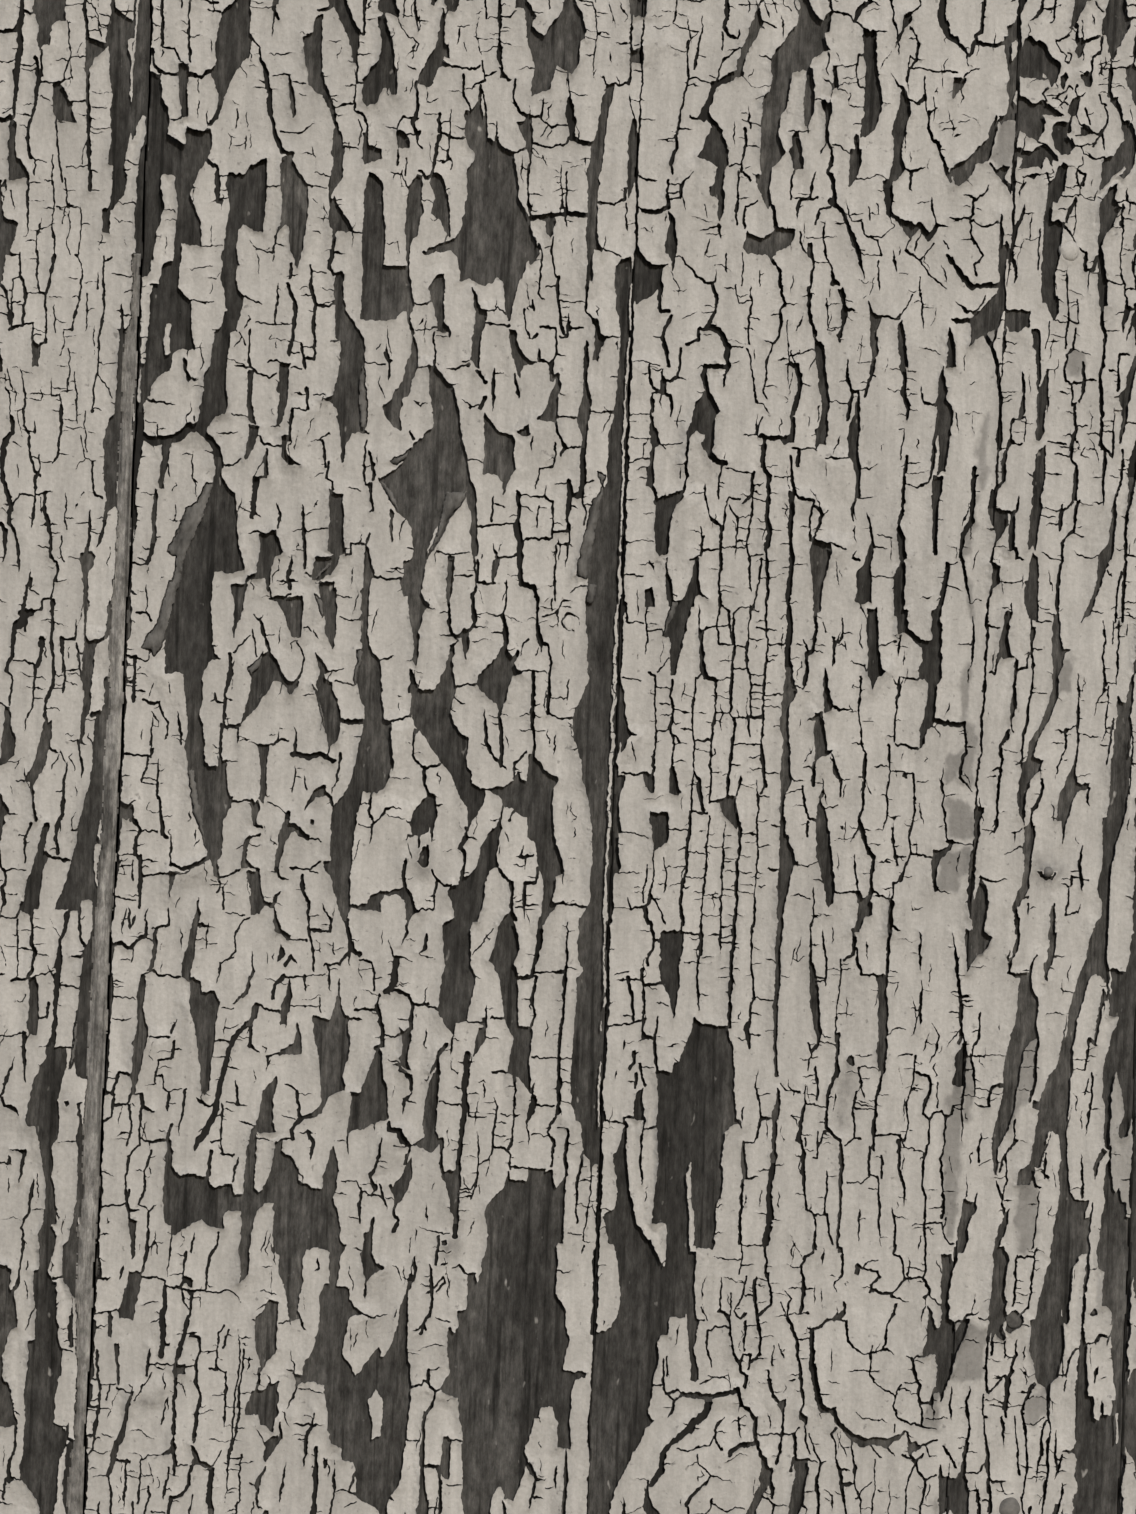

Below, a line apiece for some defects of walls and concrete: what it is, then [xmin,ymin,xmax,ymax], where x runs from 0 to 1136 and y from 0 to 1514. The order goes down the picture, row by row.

peeling [0,0,20,30]
crack [0,0,142,730]
peeling [520,495,552,540]
crack [151,0,1136,1085]
peeling [717,499,767,685]
peeling [730,646,763,717]
crack [0,733,85,1116]
crack [86,340,628,1514]
peeling [686,713,763,937]
crack [1,1149,66,1330]
crack [638,864,1131,1514]
peeling [903,1073,929,1152]